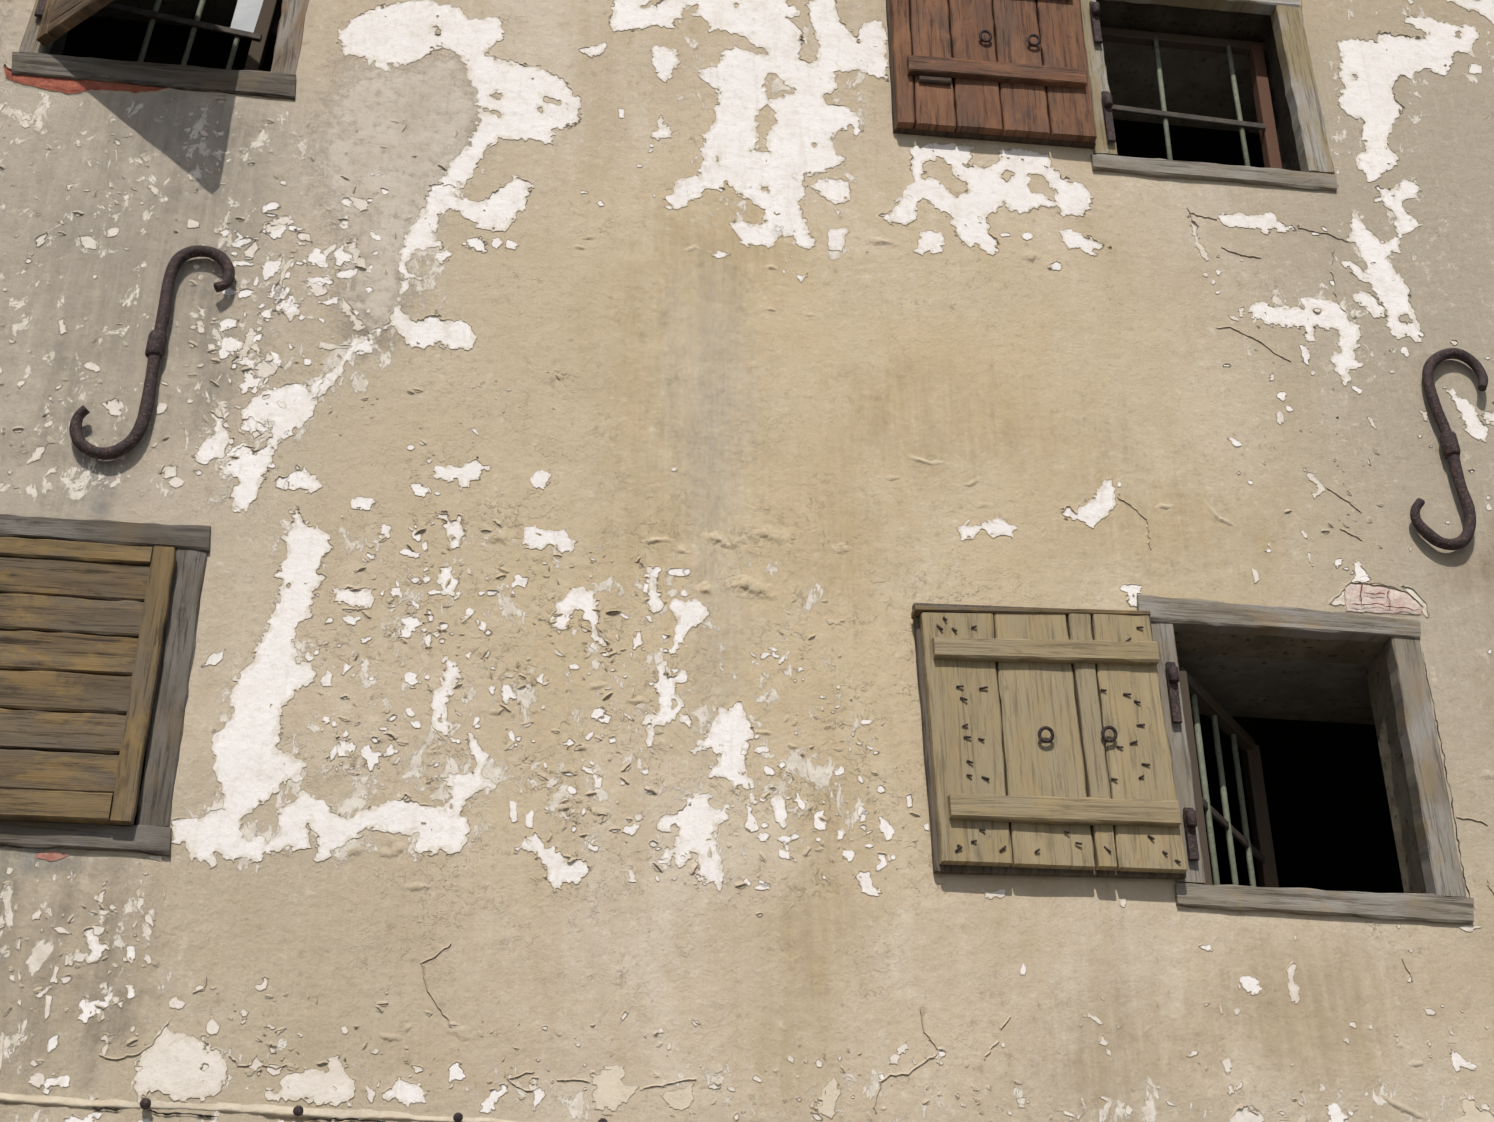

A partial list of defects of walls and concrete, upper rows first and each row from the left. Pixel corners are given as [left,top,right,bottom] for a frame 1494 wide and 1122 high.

peeling [878,142,1112,272]
crack [1186,204,1261,258]
crack [1298,227,1345,303]
crack [1216,326,1291,361]
peeling [1442,386,1494,443]
peeling [0,0,1030,1122]
flaking render [1328,558,1430,619]
peeling [1203,975,1266,1015]
peeling [1285,961,1302,1004]
peeling [1426,1030,1477,1072]
peeling [1049,1049,1396,1122]
peeling [1405,1092,1494,1122]